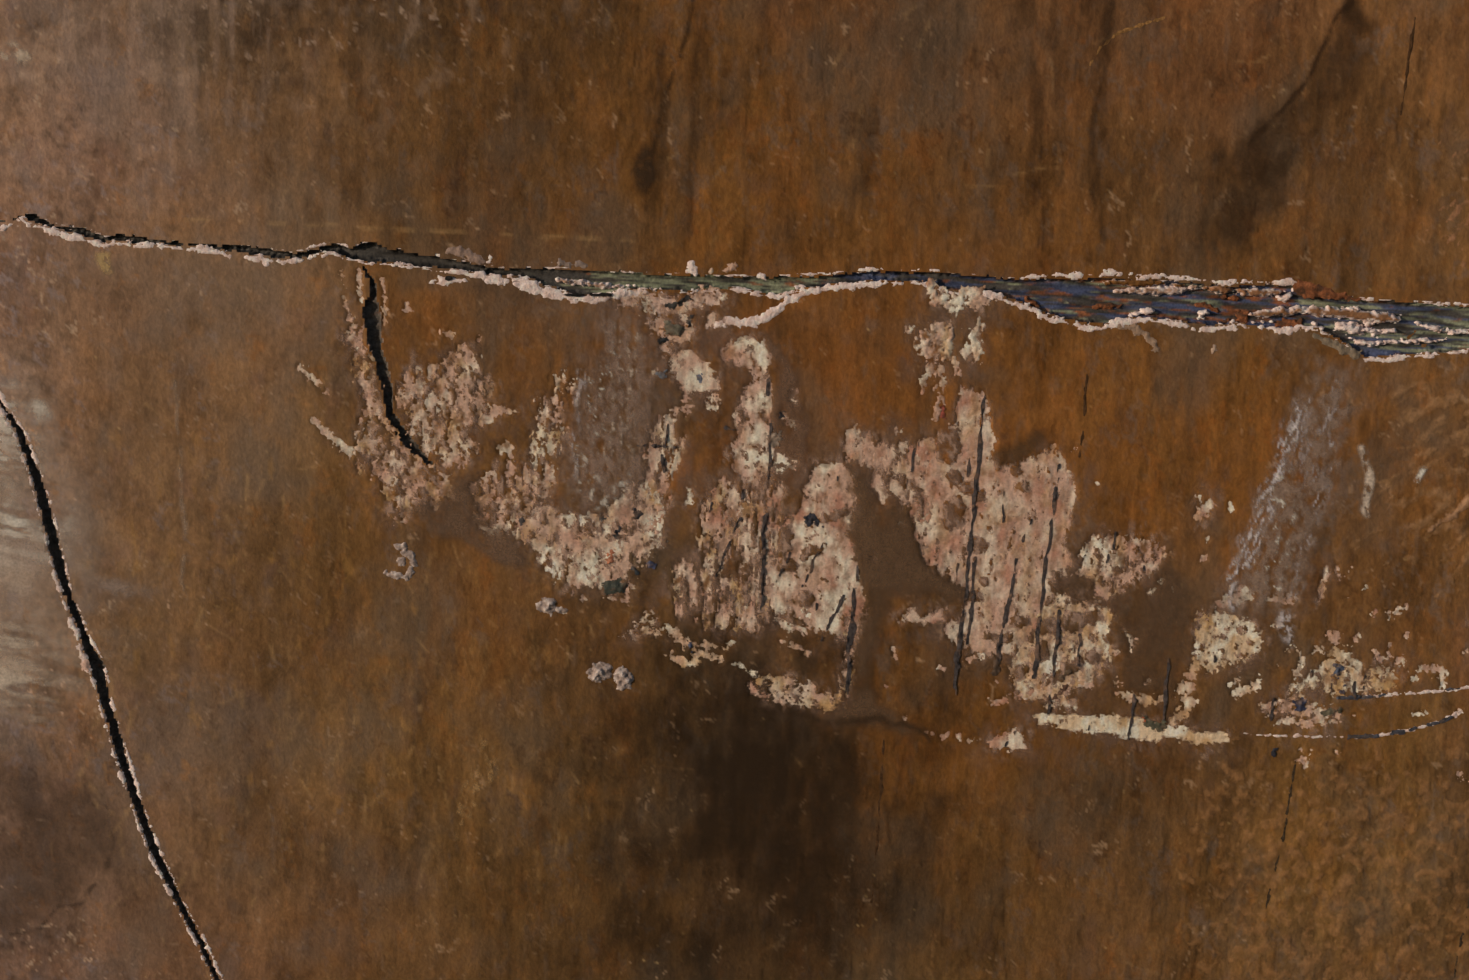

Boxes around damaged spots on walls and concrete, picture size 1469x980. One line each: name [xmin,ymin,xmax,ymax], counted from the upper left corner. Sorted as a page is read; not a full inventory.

crack [1089,16,1165,66]
crack [1400,17,1416,115]
peeling [297,363,329,395]
crack [0,213,1469,467]
rust [1194,294,1250,324]
rust [1274,318,1303,327]
peeling [310,268,1449,754]
crack [0,391,224,980]
peeling [1294,747,1313,770]
crack [1266,761,1296,908]
crack [1454,899,1469,978]